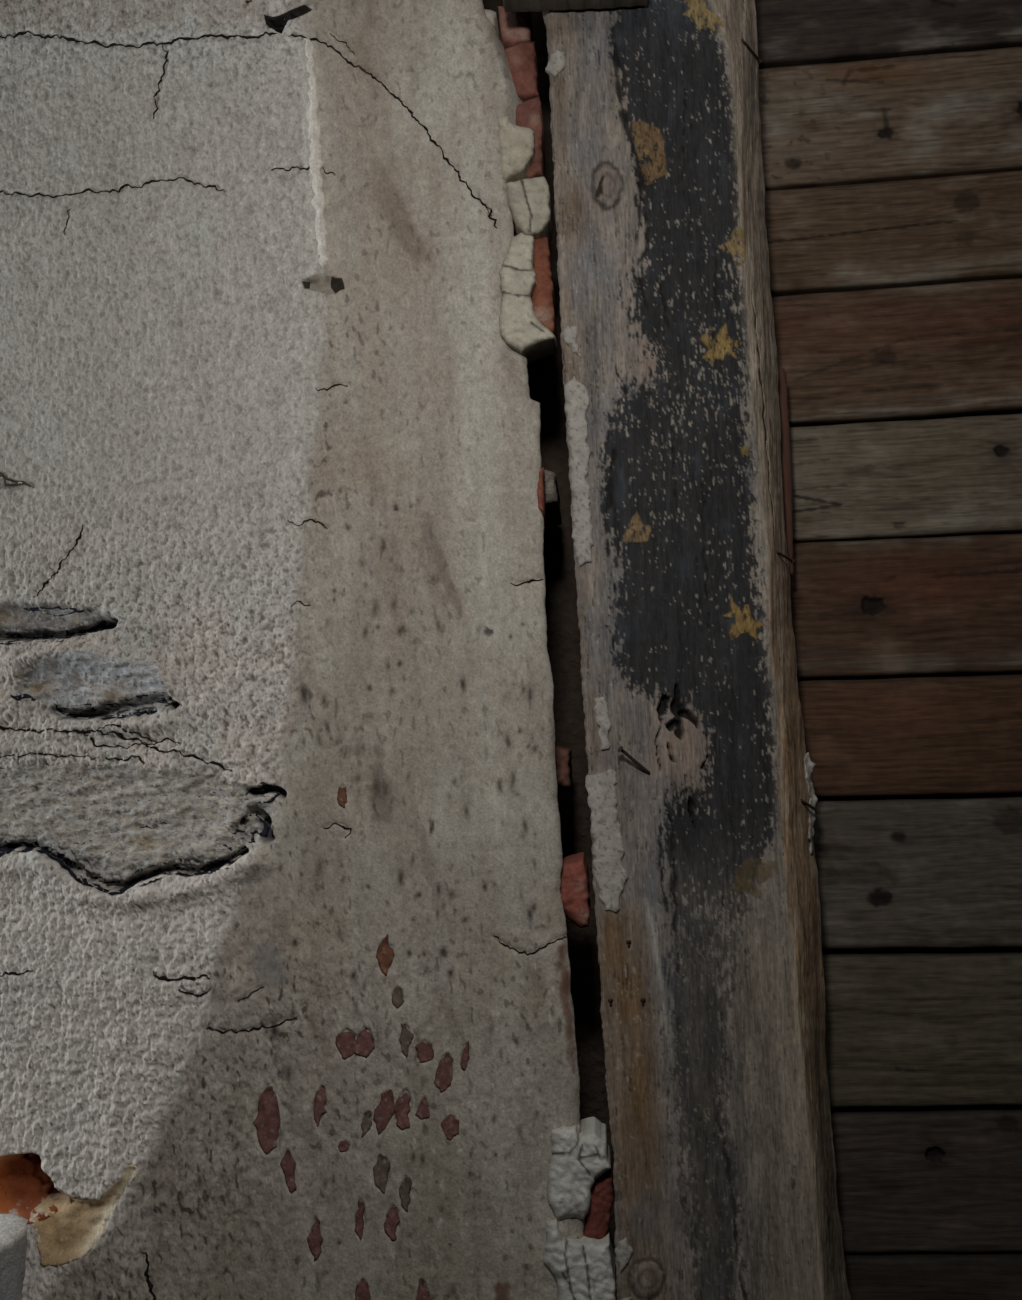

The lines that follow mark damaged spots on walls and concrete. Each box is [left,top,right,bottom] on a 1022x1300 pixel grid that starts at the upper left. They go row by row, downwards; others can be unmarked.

crack [0,31,497,235]
flaking render [0,602,177,719]
crack [0,724,232,845]
peeling [335,934,469,1152]
peeling [253,1086,297,1193]
peeling [314,1088,327,1126]
peeling [30,1165,137,1267]
peeling [307,1217,323,1261]
peeling [354,1199,365,1240]
peeling [355,1280,371,1300]
peeling [373,1153,412,1241]